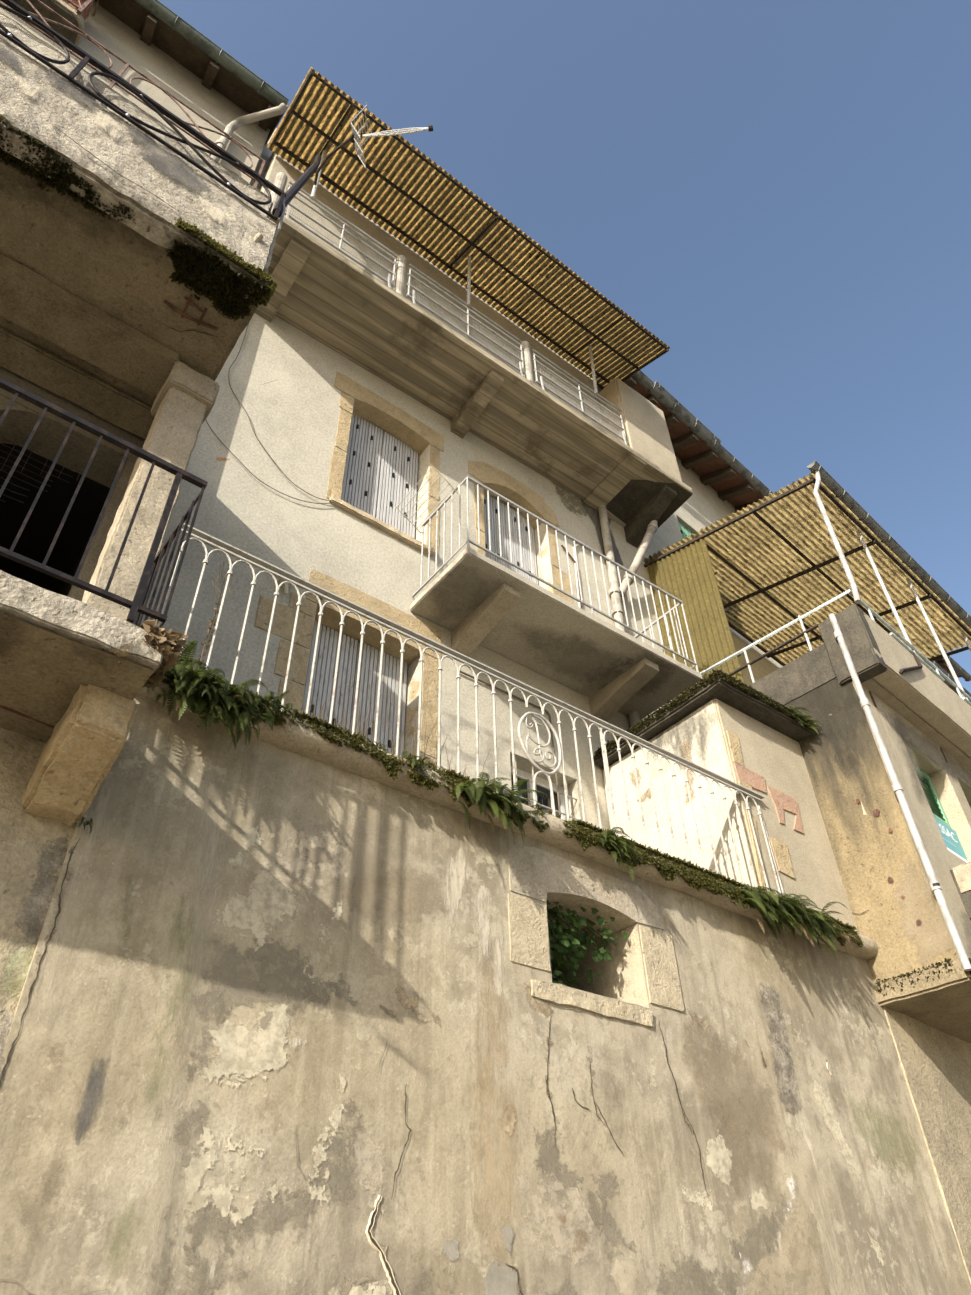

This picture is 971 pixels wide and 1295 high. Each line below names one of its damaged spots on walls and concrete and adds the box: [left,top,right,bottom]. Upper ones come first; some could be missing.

flaking render [212,821,351,951]
crack [0,838,80,1085]
flaking render [180,1124,291,1226]
flaking render [197,1003,301,1092]
flaking render [307,1073,386,1207]
crack [365,1043,411,1295]
crack [544,1016,624,1155]
crack [659,1026,709,1196]